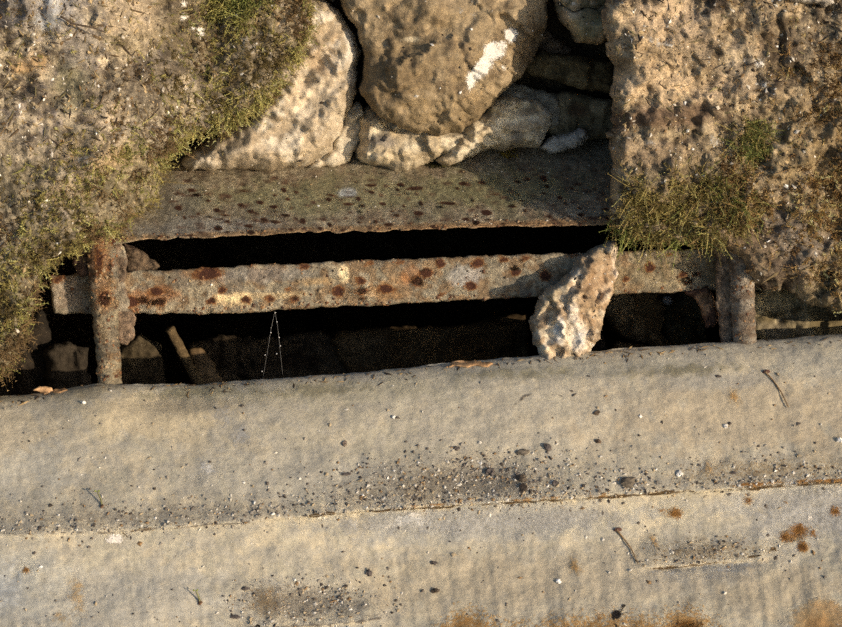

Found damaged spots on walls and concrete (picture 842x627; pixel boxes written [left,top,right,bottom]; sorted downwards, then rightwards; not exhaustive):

corrosion [188,188,447,234]
corrosion [458,194,609,227]
corrosion [72,235,172,382]
corrosion [192,267,225,281]
corrosion [178,272,398,315]
corrosion [412,257,446,287]
corrosion [457,256,535,301]
corrosion [677,262,719,329]
corrosion [780,523,816,552]
corrosion [430,601,722,627]